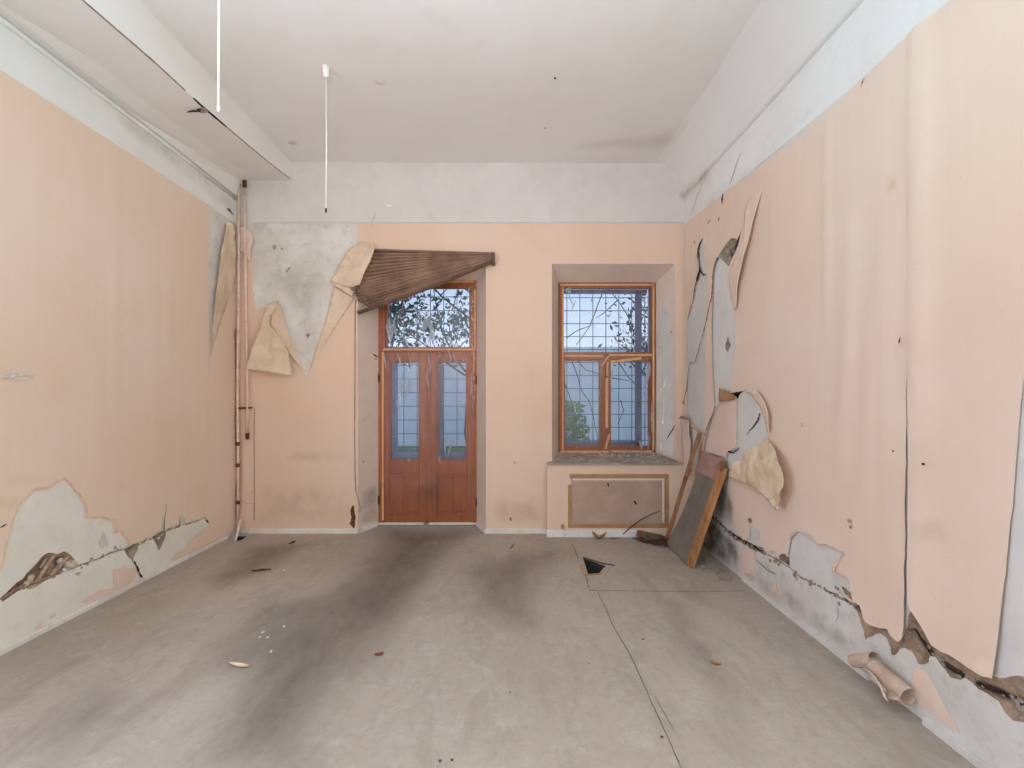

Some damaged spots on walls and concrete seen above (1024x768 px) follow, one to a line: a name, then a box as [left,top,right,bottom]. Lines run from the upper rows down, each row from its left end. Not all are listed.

peeling [208,205,236,372]
peeling [251,223,358,377]
peeling [687,235,767,481]
crack [0,514,207,600]
peeling [0,477,209,648]
spalling [577,557,611,576]
crack [711,515,859,607]
peeling [703,518,1024,768]